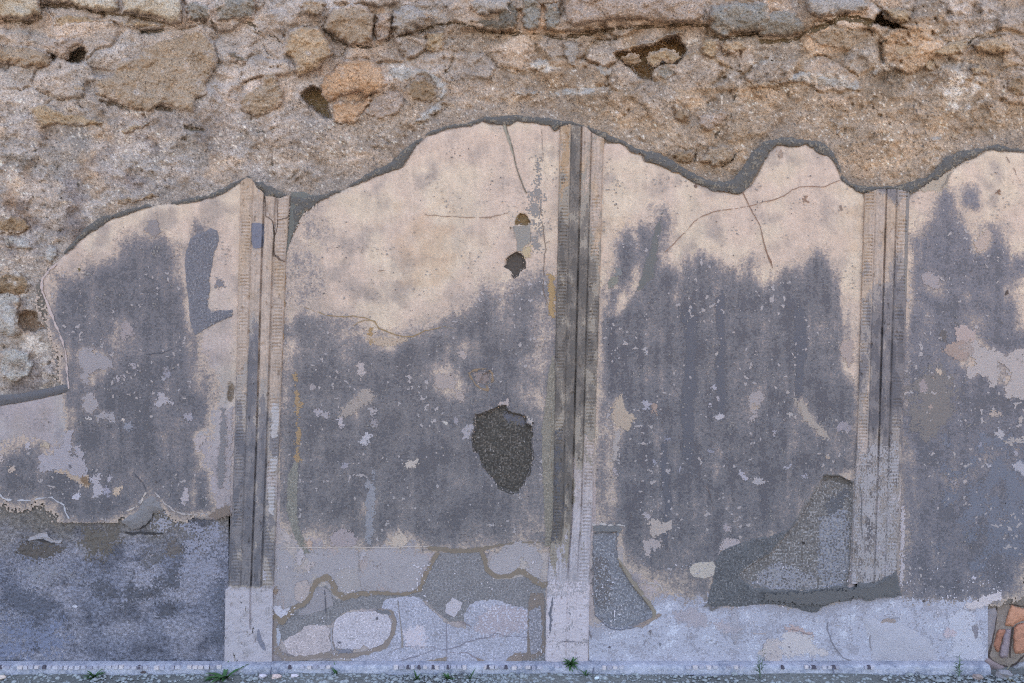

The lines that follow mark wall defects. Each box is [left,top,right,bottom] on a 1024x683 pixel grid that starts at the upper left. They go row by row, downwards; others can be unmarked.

spalling [504,252,526,278]
spalling [515,213,530,225]
crack [503,124,549,301]
crack [665,180,841,268]
peeling [40,264,141,432]
peeling [154,367,174,407]
leakage [0,124,1024,662]
peeling [941,325,1024,401]
spalling [443,398,534,494]
peeling [28,532,62,543]
spalling [257,527,528,669]
peeling [489,438,1002,674]